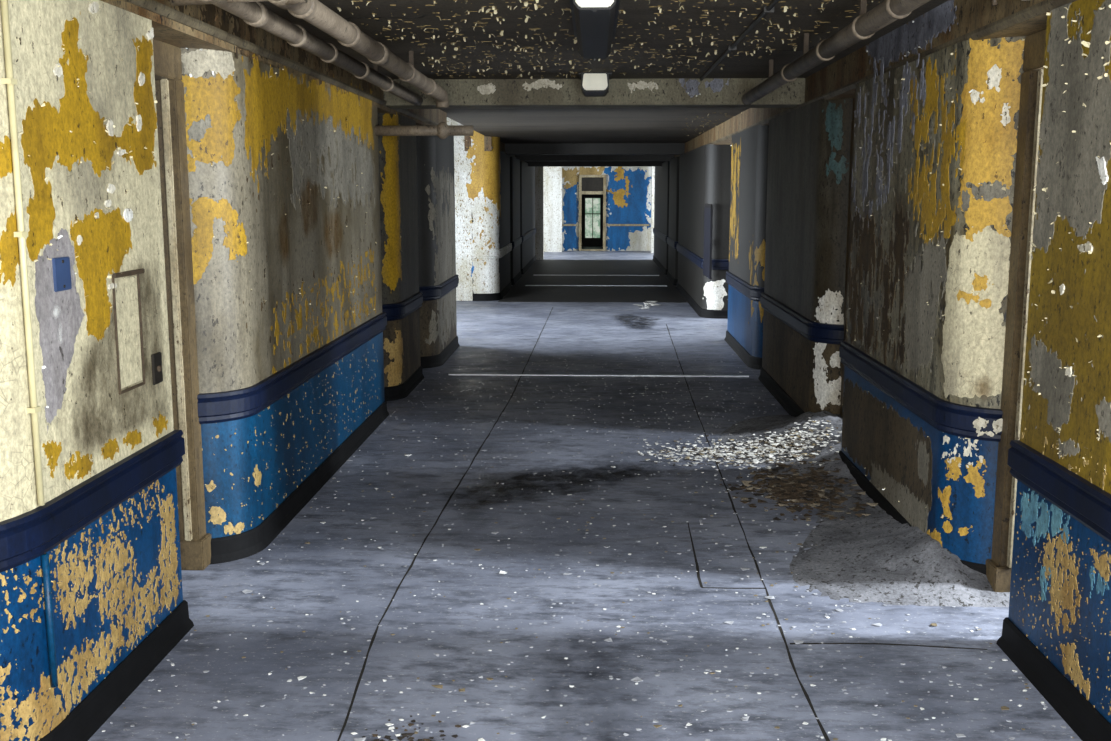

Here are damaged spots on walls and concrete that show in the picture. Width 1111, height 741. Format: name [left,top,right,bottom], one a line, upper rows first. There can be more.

peeling [0,17,157,480]
peeling [168,0,402,374]
peeling [425,131,501,349]
spalling [337,0,838,98]
peeling [562,166,651,251]
peeling [813,0,1025,546]
flaking render [1029,0,1111,259]
flaking render [1022,318,1111,490]
peeling [0,480,182,741]